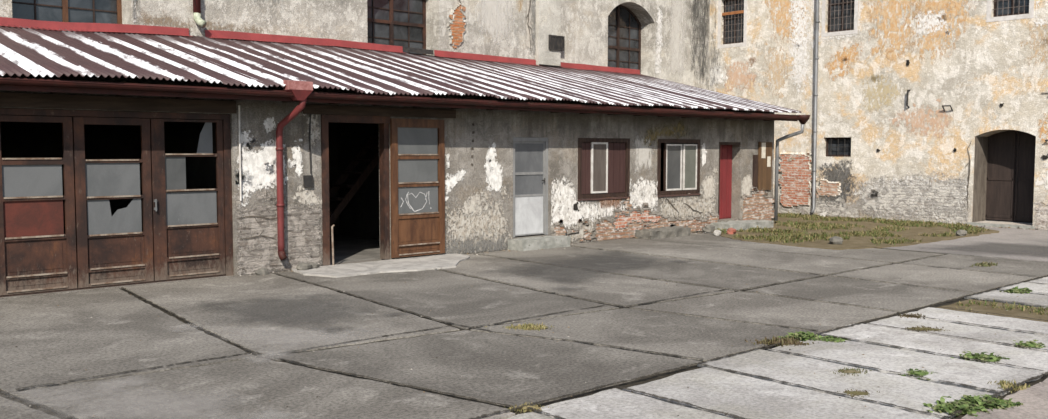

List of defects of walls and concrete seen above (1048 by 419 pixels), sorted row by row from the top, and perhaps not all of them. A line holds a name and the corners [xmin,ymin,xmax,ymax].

flaking render [446,0,467,48]
flaking render [235,111,323,275]
peeling [434,123,512,255]
flaking render [550,143,970,243]
flaking render [1034,154,1048,229]